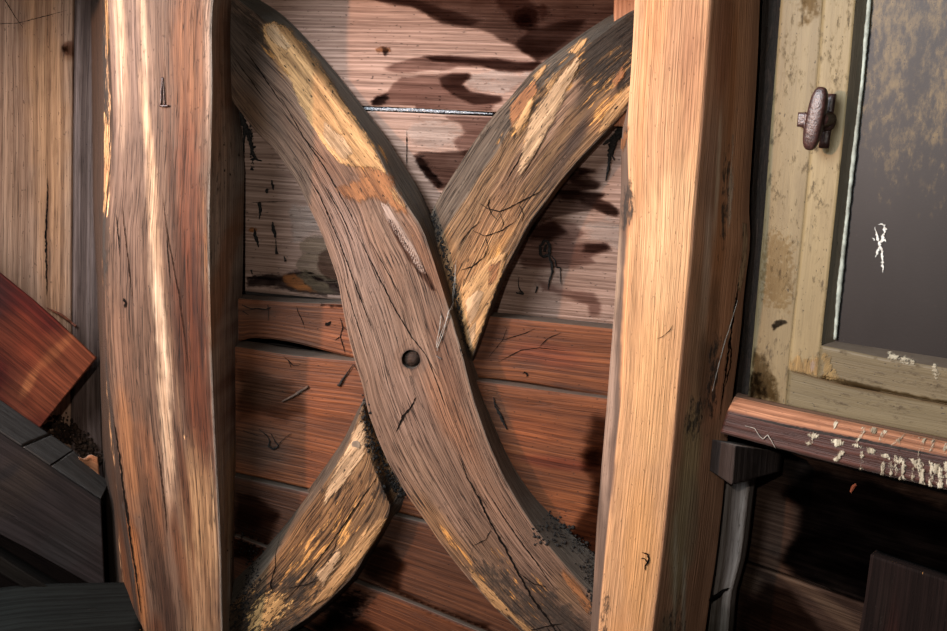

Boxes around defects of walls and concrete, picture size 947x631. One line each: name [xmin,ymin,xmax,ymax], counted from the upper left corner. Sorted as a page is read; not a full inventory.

crack [458,128,550,270]
crack [113,416,141,612]
crack [458,455,563,631]